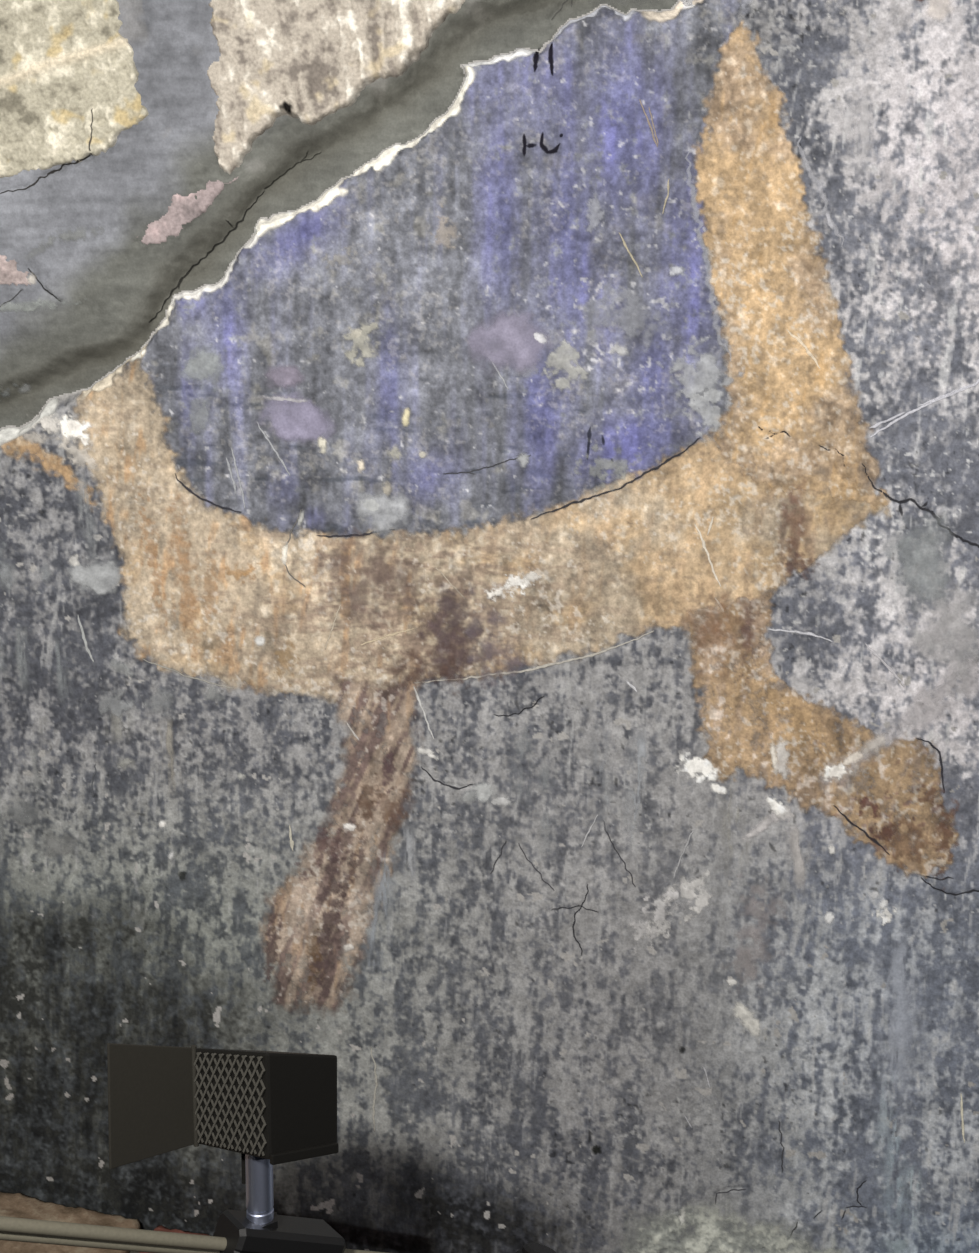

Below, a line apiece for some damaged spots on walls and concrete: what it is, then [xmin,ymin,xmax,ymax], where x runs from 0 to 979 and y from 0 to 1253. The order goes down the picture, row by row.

spalling [553,0,703,40]
spalling [245,48,535,248]
spalling [156,263,233,333]
spalling [83,346,146,396]
spalling [344,323,377,366]
spalling [534,333,587,389]
spalling [672,337,743,435]
spalling [0,398,95,469]
crack [819,445,979,547]
crack [491,842,598,955]
crack [921,876,979,896]